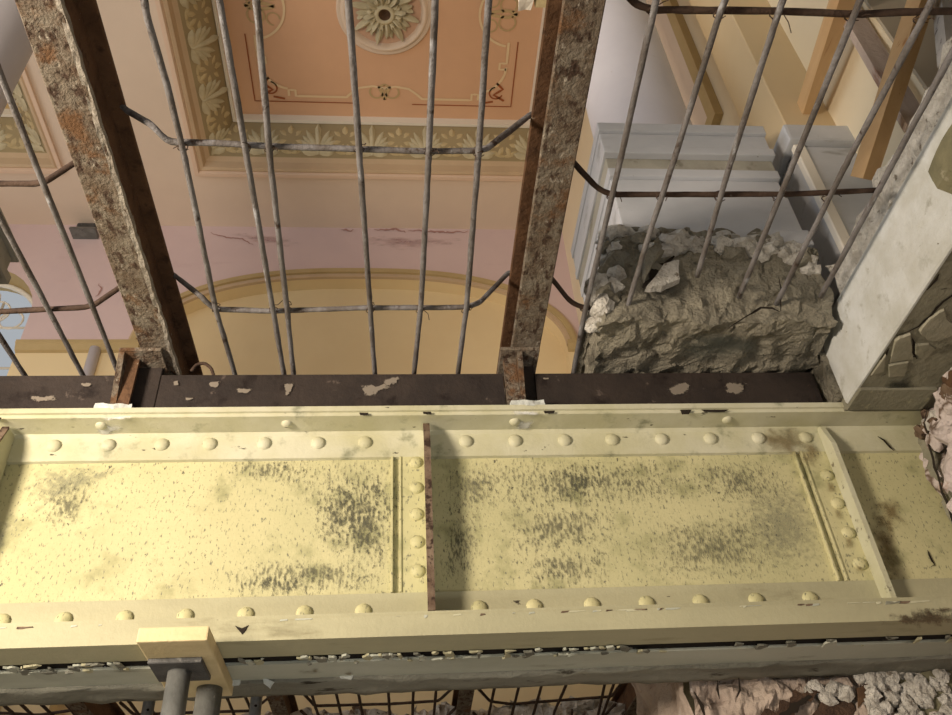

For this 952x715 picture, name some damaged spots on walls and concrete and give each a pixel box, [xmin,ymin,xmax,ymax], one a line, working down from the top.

spalling [584,37,952,333]
crack [870,274,952,377]
mould [45,479,92,525]
mould [227,460,399,596]
rust [423,423,436,611]
mould [444,457,786,586]